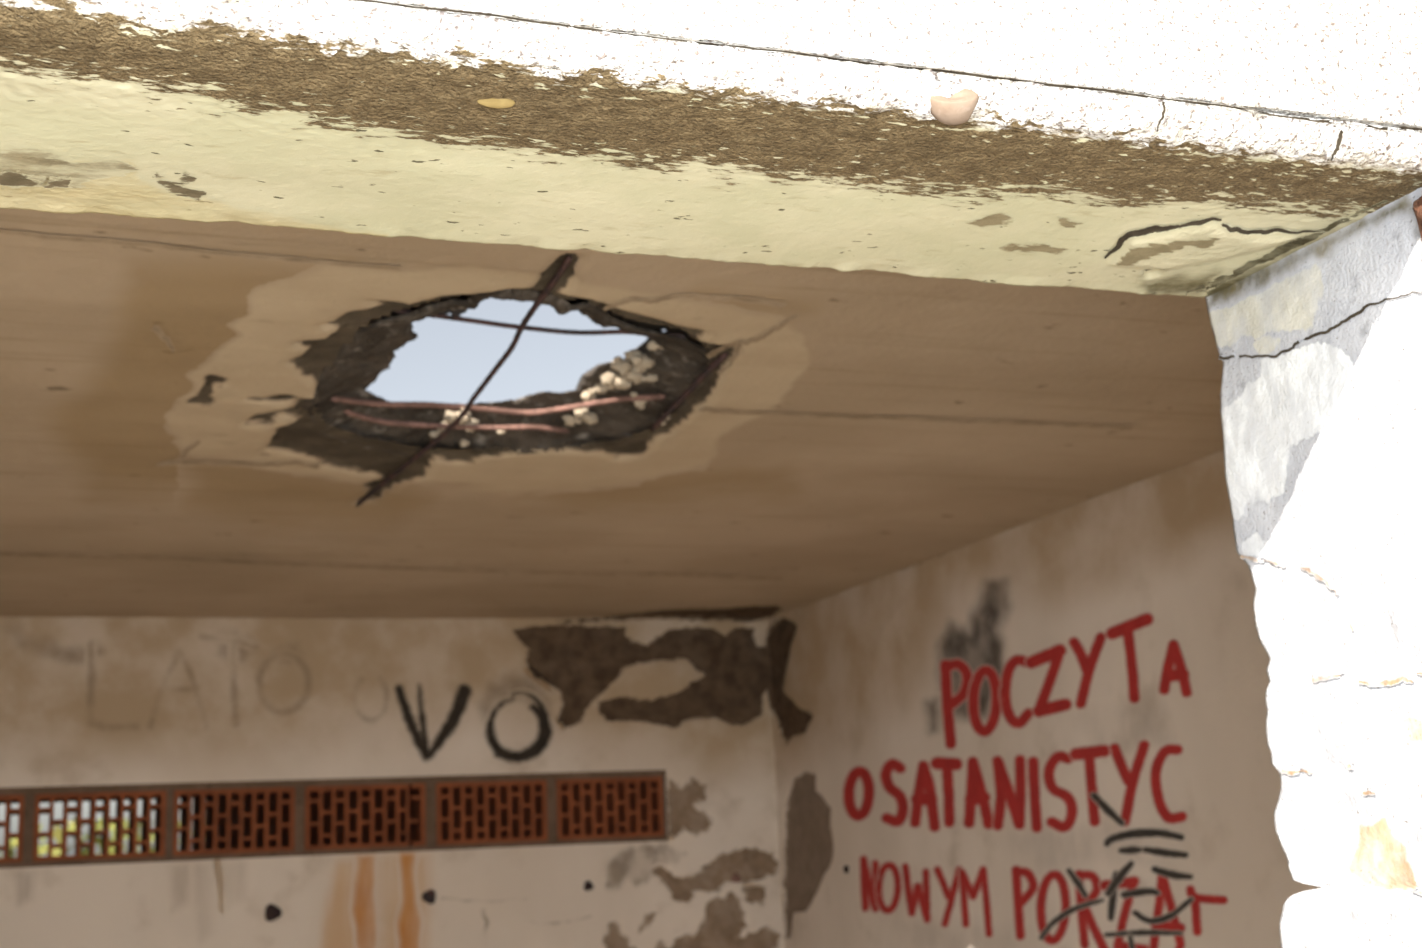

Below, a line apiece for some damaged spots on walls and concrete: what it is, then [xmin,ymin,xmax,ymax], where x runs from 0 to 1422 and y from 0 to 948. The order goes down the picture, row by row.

crack [1104,200,1388,295]
spalling [244,253,735,505]
crack [1219,291,1422,361]
spalling [512,604,814,747]
rust [313,850,437,948]
spalling [602,771,834,948]